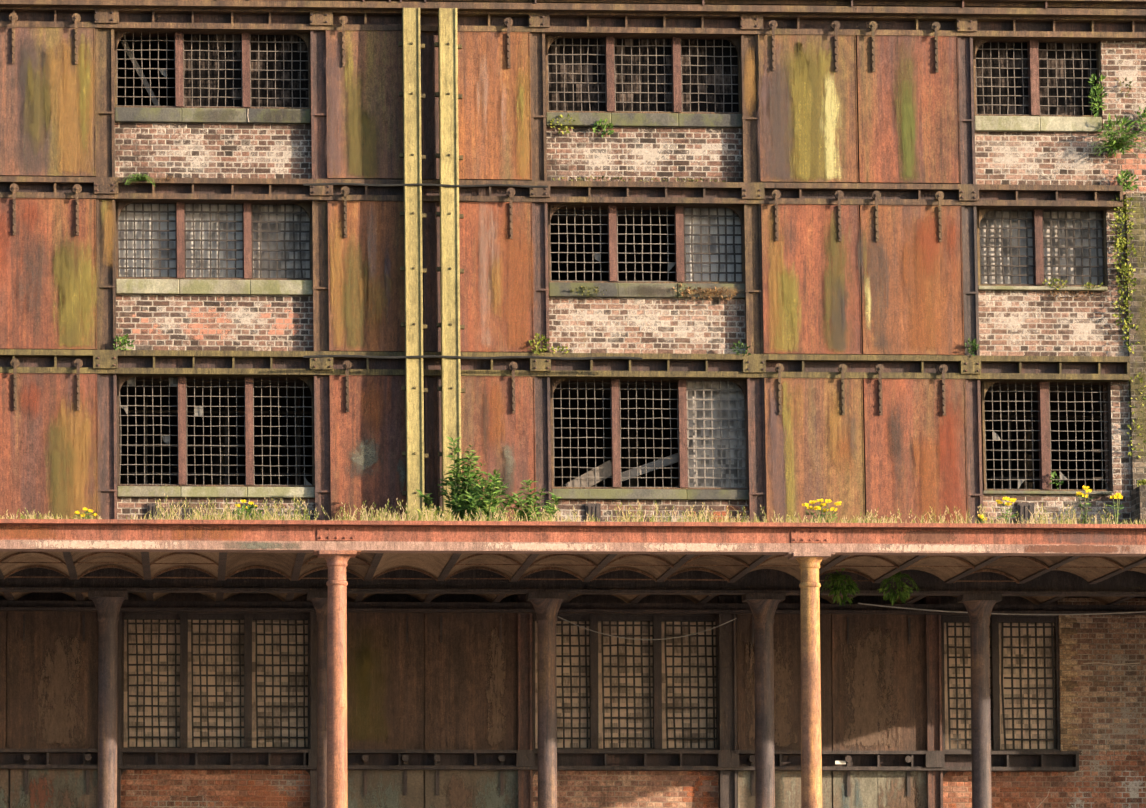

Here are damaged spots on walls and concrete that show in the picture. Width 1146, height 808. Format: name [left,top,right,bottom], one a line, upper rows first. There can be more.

corrosion [517,70,529,178]
water stain [759,49,840,180]
water stain [896,61,916,179]
corrosion [331,224,391,347]
corrosion [50,406,95,519]